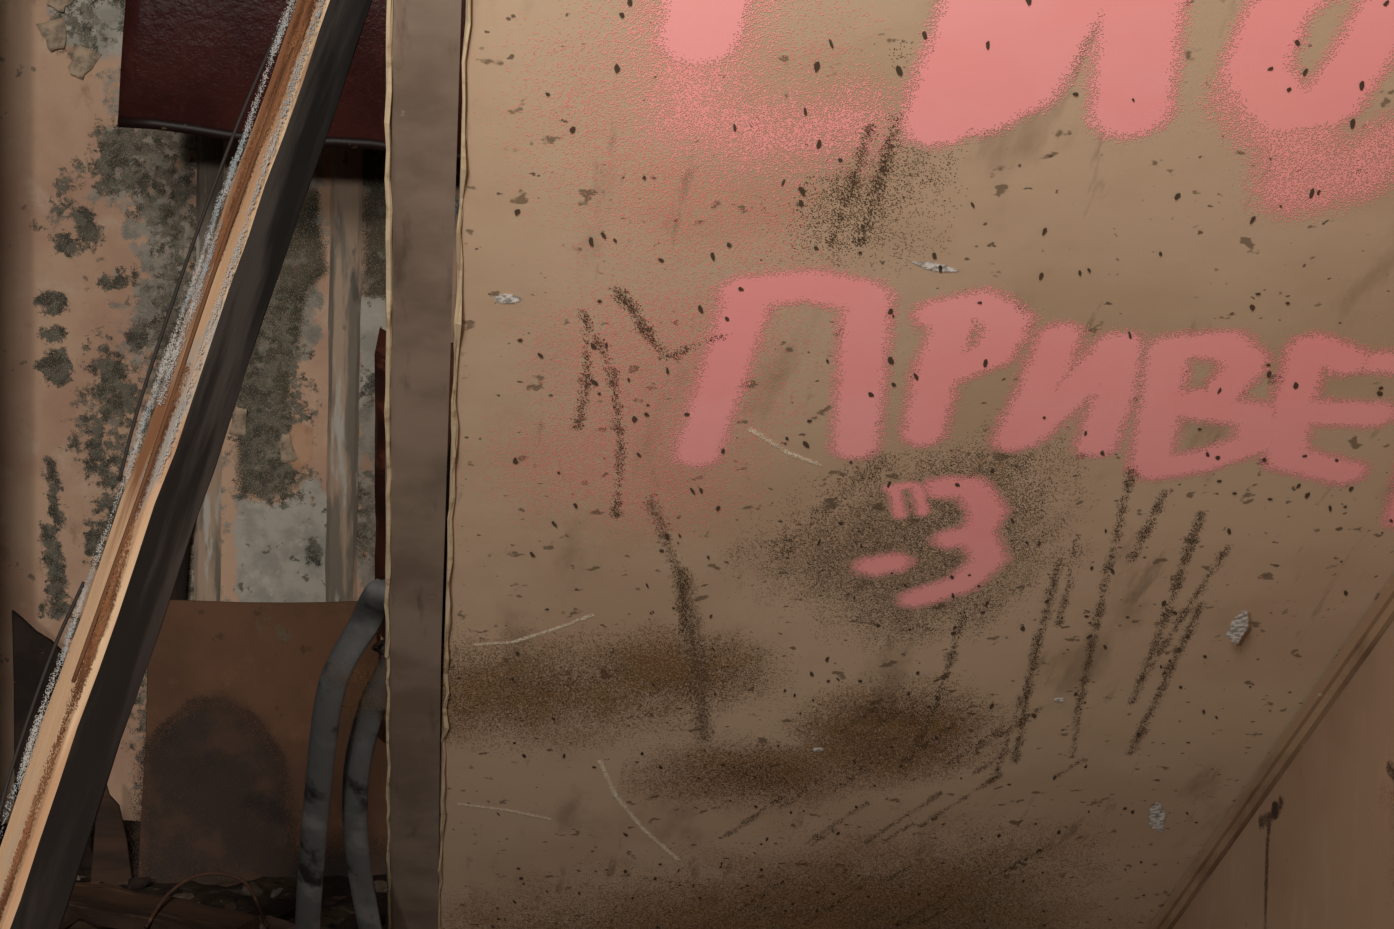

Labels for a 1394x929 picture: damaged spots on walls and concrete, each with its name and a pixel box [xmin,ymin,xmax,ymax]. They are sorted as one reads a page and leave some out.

water stain [28,66,197,639]
water stain [118,669,302,887]
water stain [220,164,331,557]
water stain [356,352,376,590]
water stain [440,420,1174,929]
water stain [1124,511,1234,755]